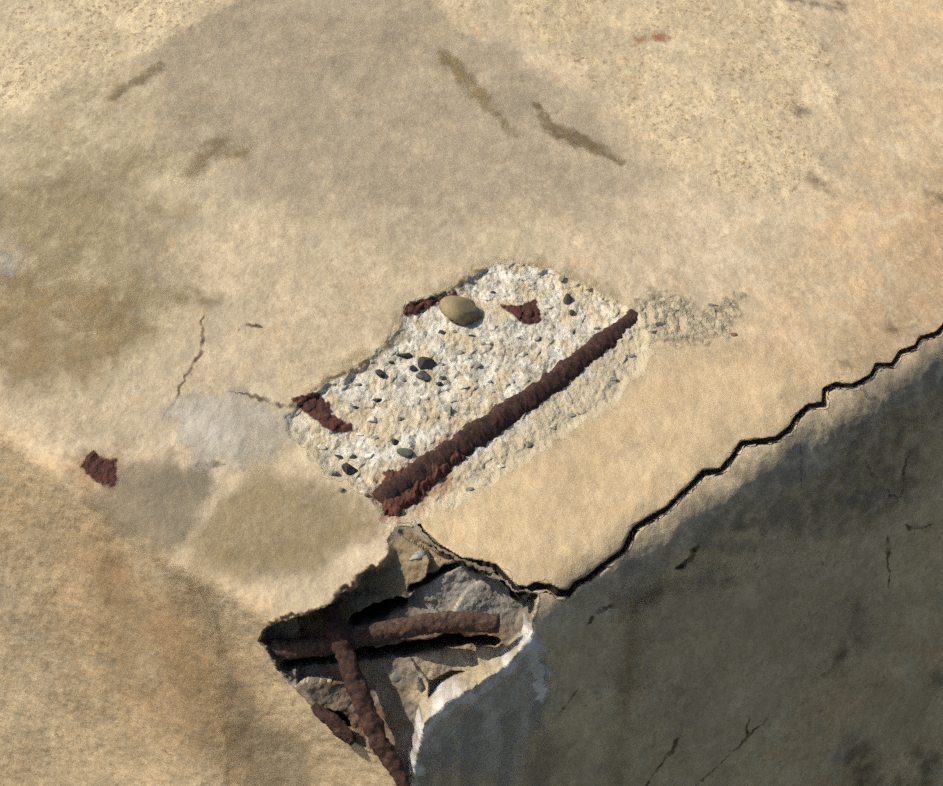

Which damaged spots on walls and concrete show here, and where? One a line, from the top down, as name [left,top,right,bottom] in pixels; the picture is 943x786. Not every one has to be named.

leakage [426,43,624,167]
leakage [0,171,141,379]
corrosion [80,450,118,489]
crack [162,316,204,419]
crack [231,362,364,408]
corrosion [292,392,352,432]
crack [412,325,943,601]
leakage [200,477,373,579]
crack [333,559,385,597]
spalling [162,257,746,786]
corrosion [310,703,357,746]
leakage [408,623,551,786]